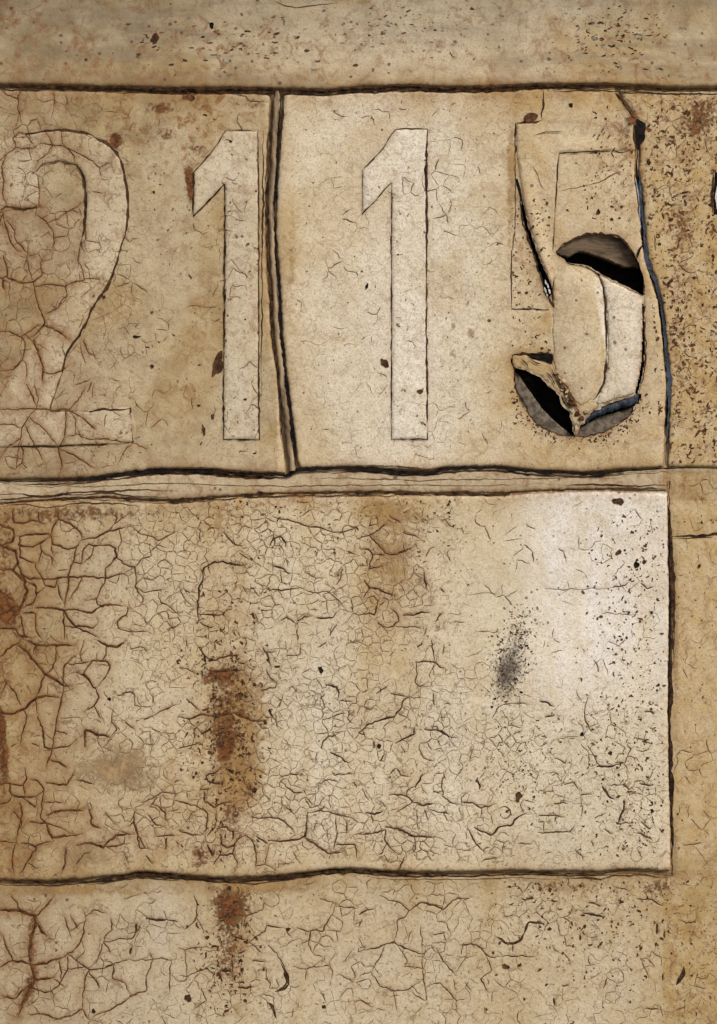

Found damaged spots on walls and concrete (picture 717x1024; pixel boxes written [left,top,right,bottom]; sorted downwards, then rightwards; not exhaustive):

crack [319,137,503,265]
crack [301,254,430,347]
peeling [559,379,586,431]
crack [503,514,535,573]
crack [545,541,652,605]
crack [594,606,660,678]
corrosion [204,667,255,790]
crack [558,690,596,742]
crack [533,808,582,834]
corrosion [212,881,251,987]
crack [586,951,664,1024]
crack [676,939,717,1024]